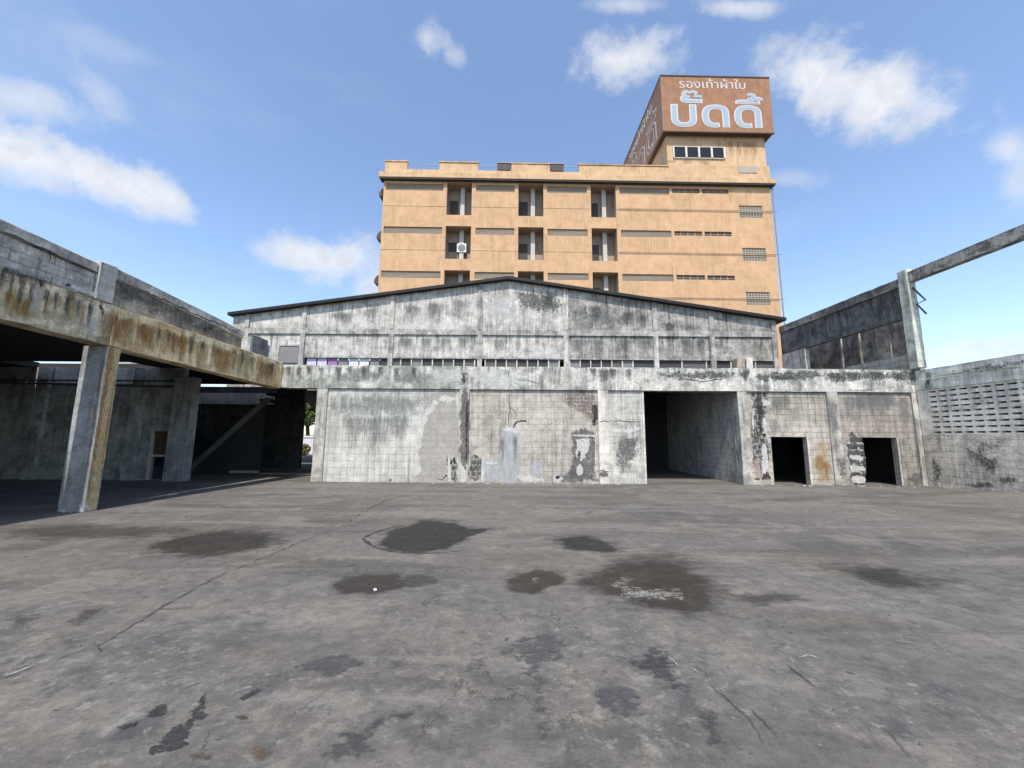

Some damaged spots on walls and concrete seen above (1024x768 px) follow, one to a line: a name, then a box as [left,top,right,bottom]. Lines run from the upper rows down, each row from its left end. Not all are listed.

damp [514,289,562,314]
corrosion [87,313,276,512]
peeling [412,369,466,483]
peeling [481,456,501,482]
spalling [564,391,608,478]
peeling [752,399,771,480]
corrosion [815,442,829,482]
peeling [846,432,866,486]
damp [15,526,286,558]
damp [363,520,491,553]
damp [509,569,563,593]
damp [562,536,721,614]